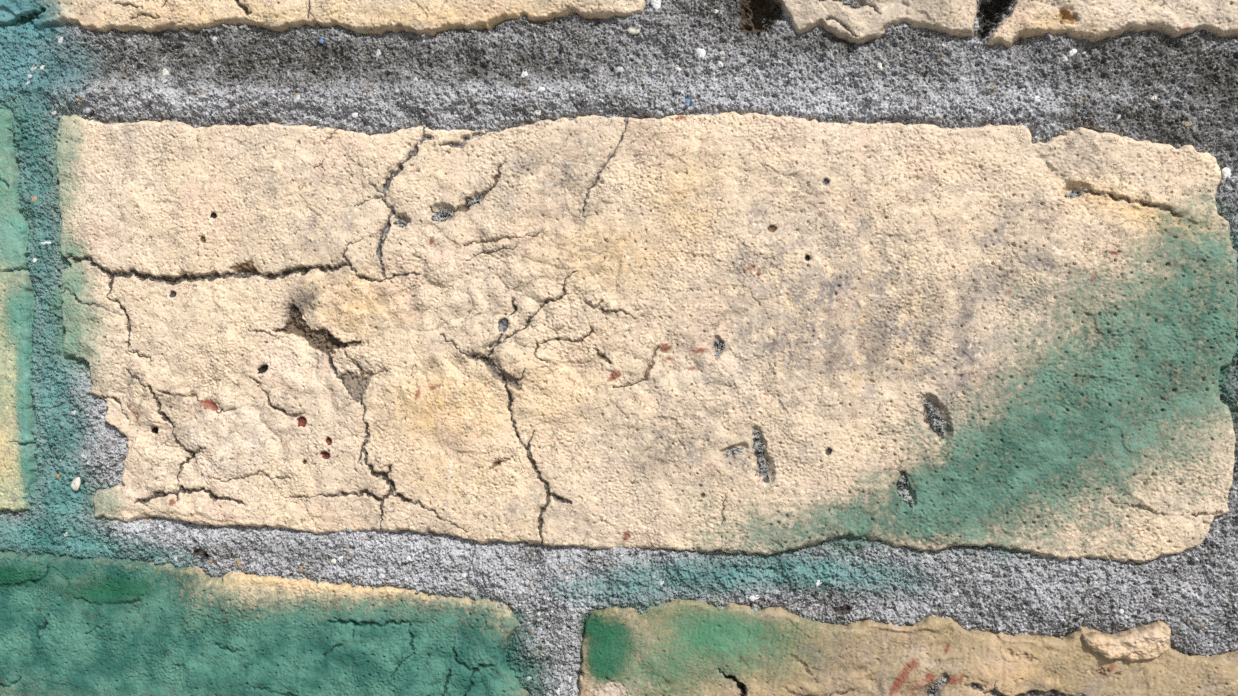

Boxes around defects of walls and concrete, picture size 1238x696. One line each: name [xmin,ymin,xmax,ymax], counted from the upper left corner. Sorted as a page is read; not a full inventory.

crack [114,0,167,20]
crack [235,0,251,15]
crack [826,0,881,37]
crack [582,117,629,216]
crack [431,162,505,221]
crack [464,232,540,261]
crack [61,126,493,532]
crack [440,271,659,546]
crack [719,669,746,696]
crack [786,655,853,696]